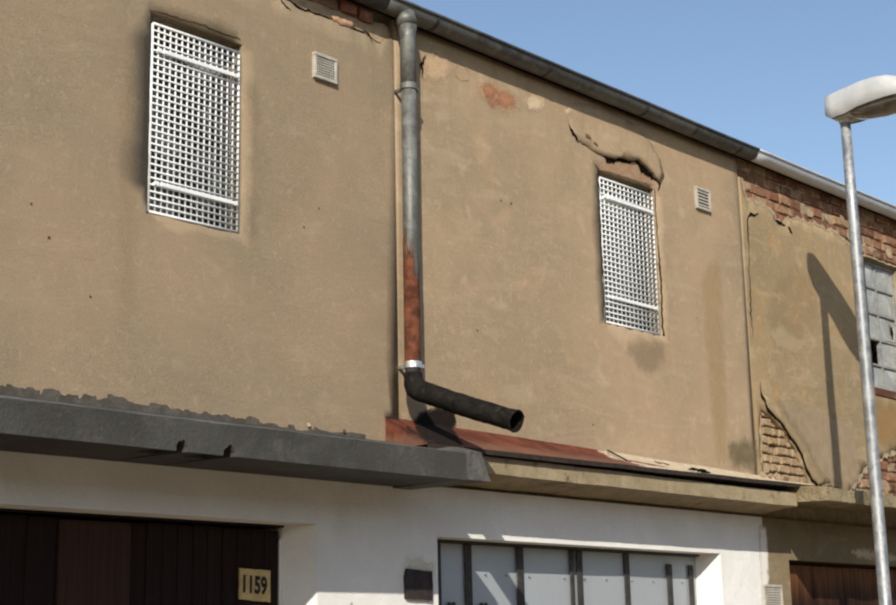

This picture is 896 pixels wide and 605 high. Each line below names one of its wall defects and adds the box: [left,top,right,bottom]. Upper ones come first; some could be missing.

flaking render [291,0,392,43]
flaking render [479,83,544,111]
flaking render [599,162,654,185]
flaking render [736,158,896,267]
corrosion [403,226,421,361]
crack [747,212,758,328]
peeling [0,384,366,439]
flaking render [759,411,806,483]
flaking render [850,465,870,492]
flaking render [880,450,896,496]